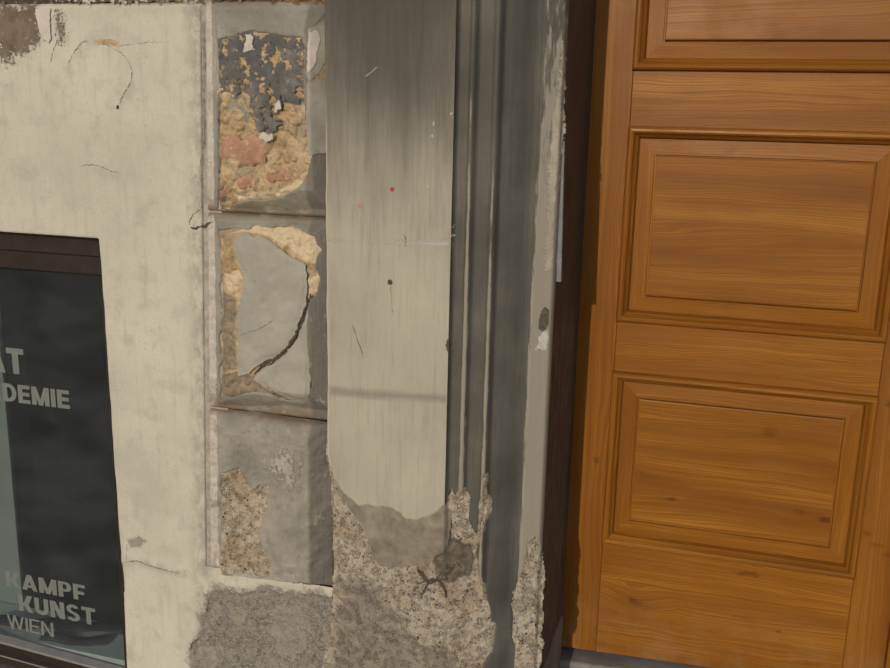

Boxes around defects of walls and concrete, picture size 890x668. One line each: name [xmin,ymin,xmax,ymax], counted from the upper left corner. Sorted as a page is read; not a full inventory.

peeling [0,0,66,70]
flaking render [217,19,326,209]
flaking render [219,225,321,401]
crack [251,294,311,377]
flaking render [189,442,496,668]
flaking render [511,537,546,668]